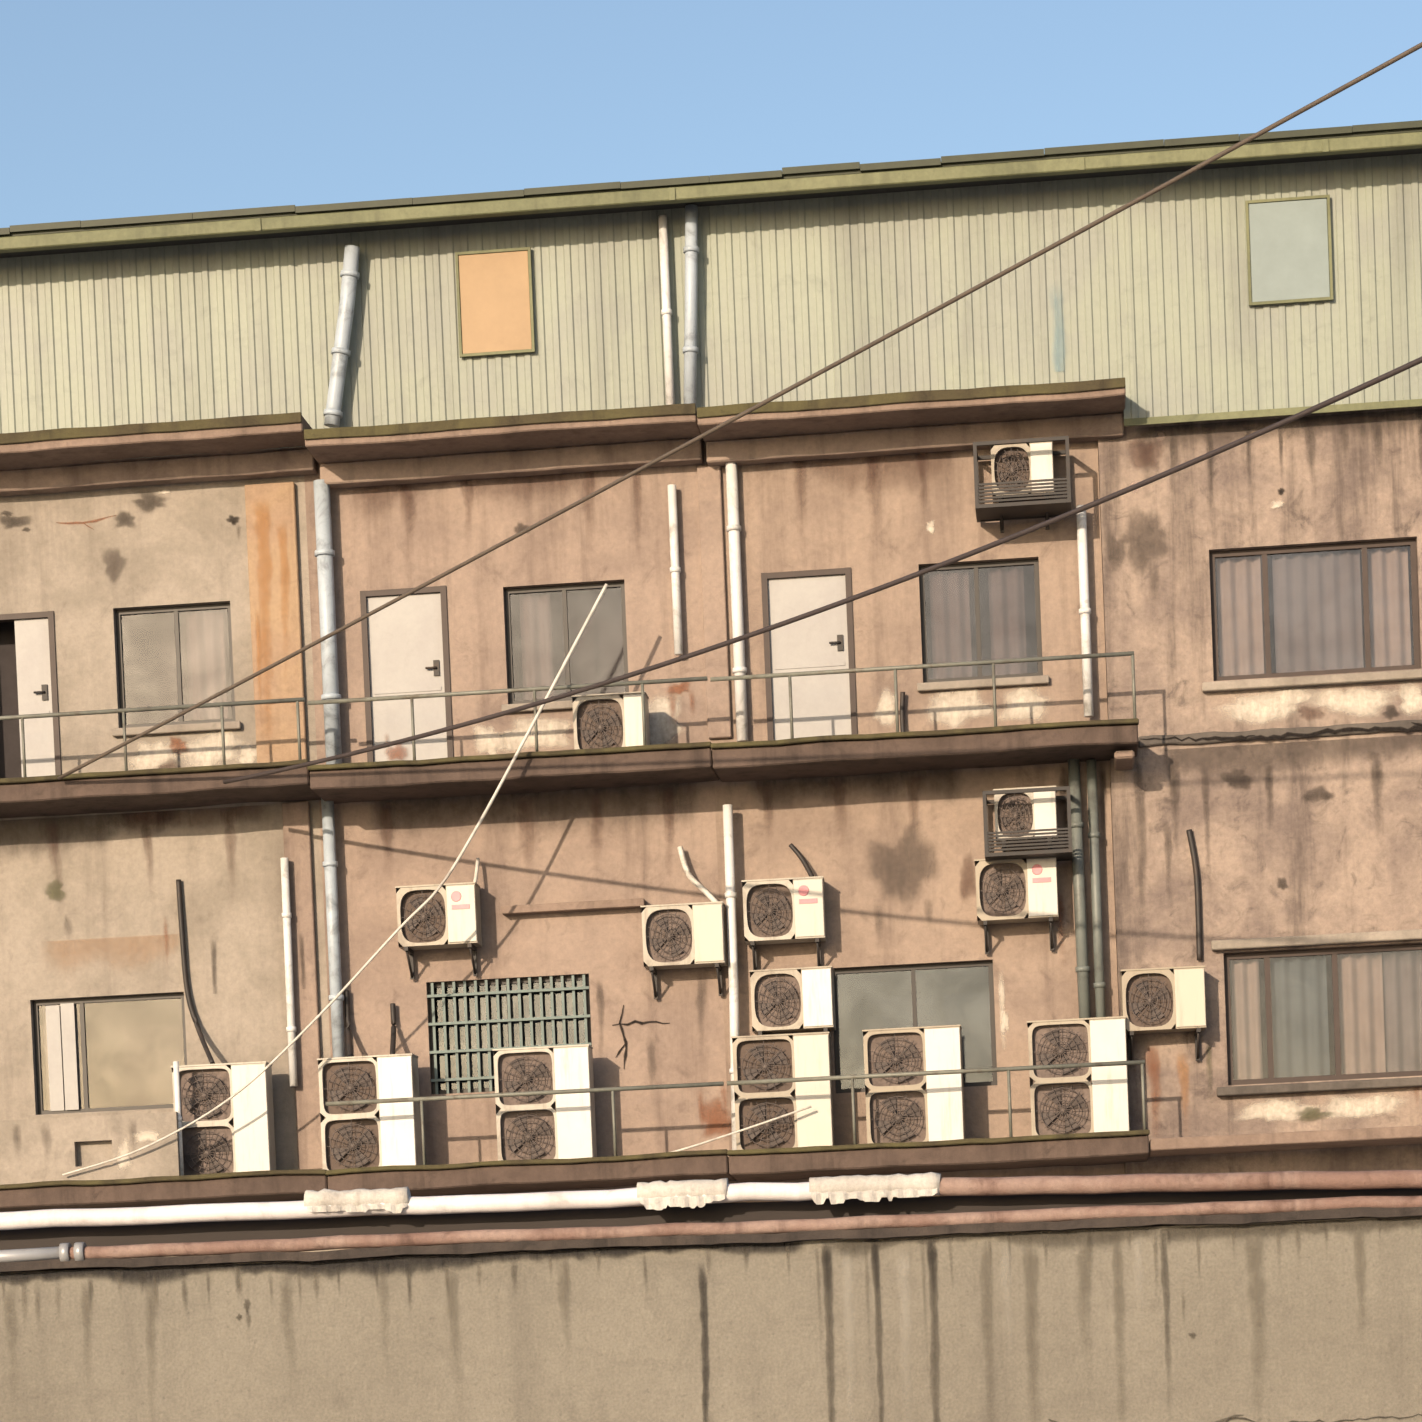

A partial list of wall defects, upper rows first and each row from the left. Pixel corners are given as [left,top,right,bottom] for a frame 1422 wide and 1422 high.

peeling [875,692,895,724]
peeling [929,688,1045,727]
peeling [1224,686,1422,723]
crack [1143,722,1422,742]
leakage [1172,735,1422,789]
crack [612,1005,668,1067]
leakage [700,1274,708,1420]
crack [1216,1414,1254,1422]
crack [1290,1414,1422,1422]